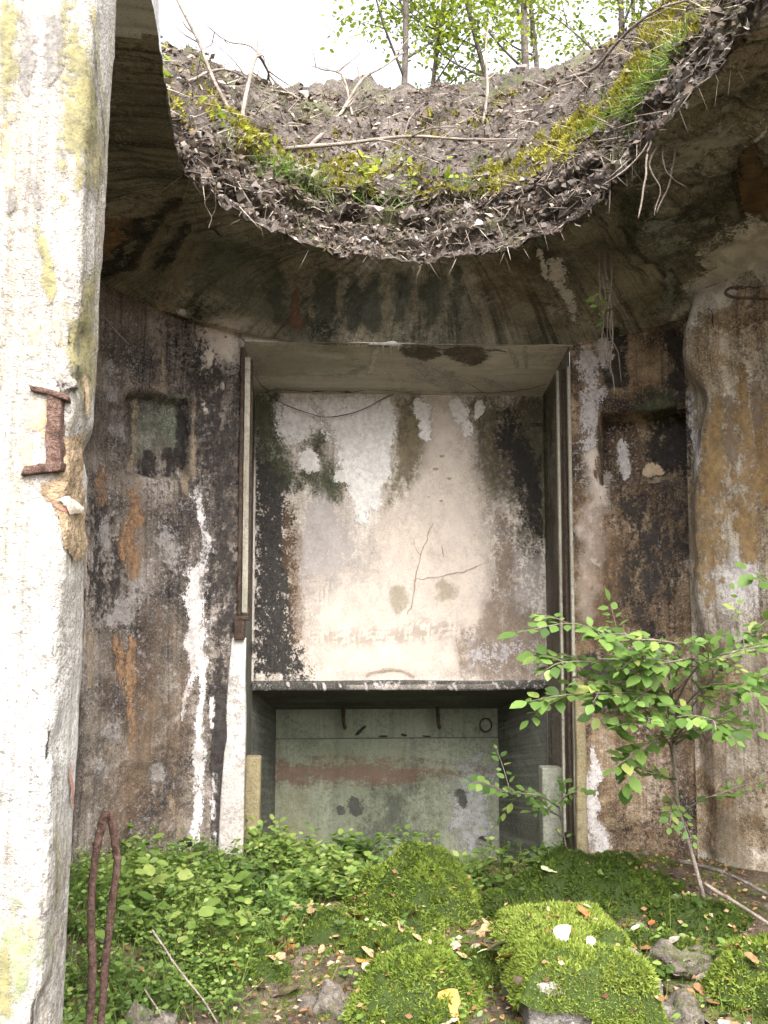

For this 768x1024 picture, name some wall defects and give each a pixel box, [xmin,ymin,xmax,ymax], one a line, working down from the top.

damp [311,265,464,333]
rust [22,402,47,465]
spalling [37,433,88,563]
damp [84,504,147,688]
rust [118,488,145,580]
damp [107,397,229,847]
damp [251,431,373,691]
flaking render [273,392,495,687]
damp [410,397,436,442]
crack [407,523,484,614]
damp [573,327,768,647]
rust [112,634,137,753]